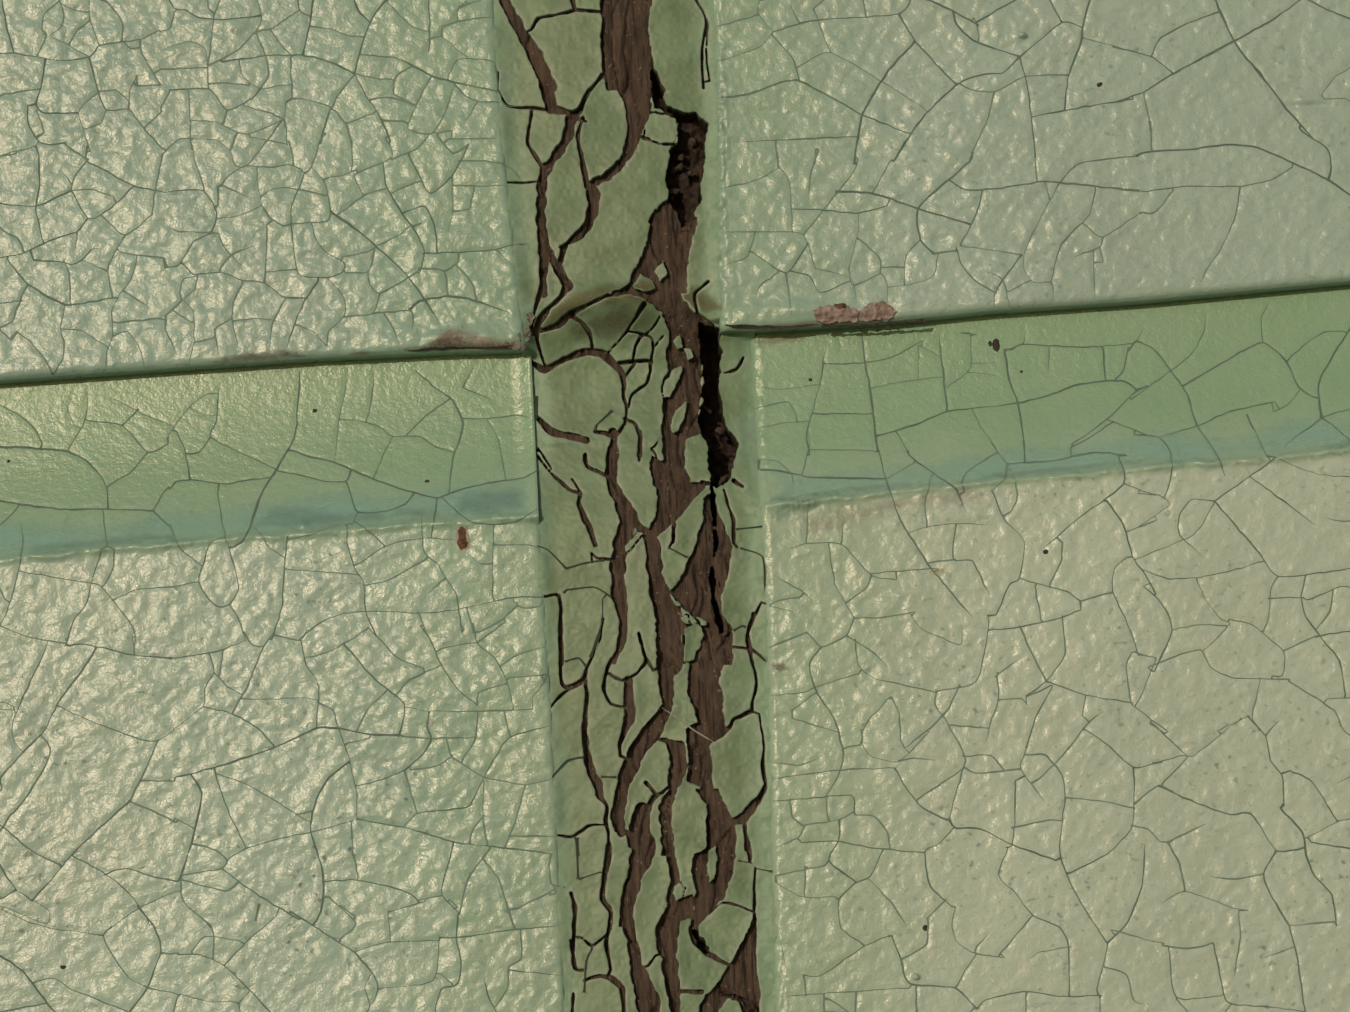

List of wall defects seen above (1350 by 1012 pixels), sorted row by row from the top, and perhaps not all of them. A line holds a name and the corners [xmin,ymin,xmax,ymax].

crack [0,0,820,1012]
peeling [490,0,778,1012]
crack [695,0,1350,314]
crack [755,304,1350,1012]